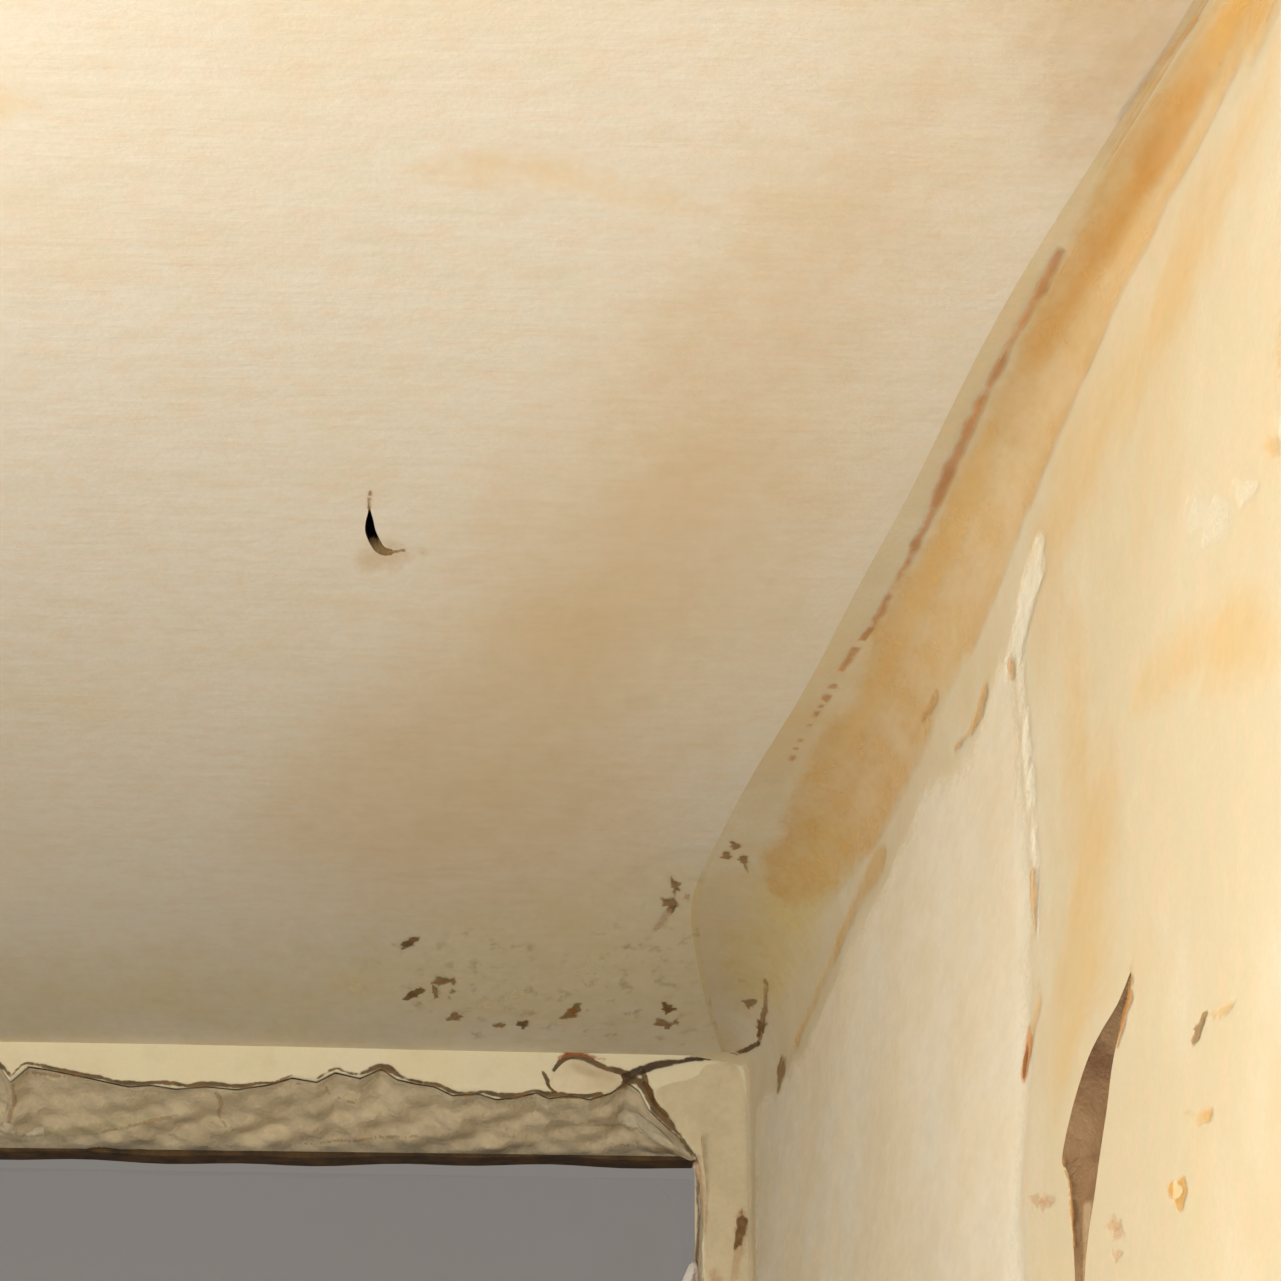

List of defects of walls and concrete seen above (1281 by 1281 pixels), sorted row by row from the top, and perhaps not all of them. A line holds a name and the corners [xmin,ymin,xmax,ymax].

peeling [662,879,681,911]
peeling [403,977,456,1001]
peeling [560,1003,581,1019]
peeling [654,1002,678,1029]
crack [621,1041,760,1118]
spalling [0,1053,698,1161]
spalling [682,1261,699,1281]